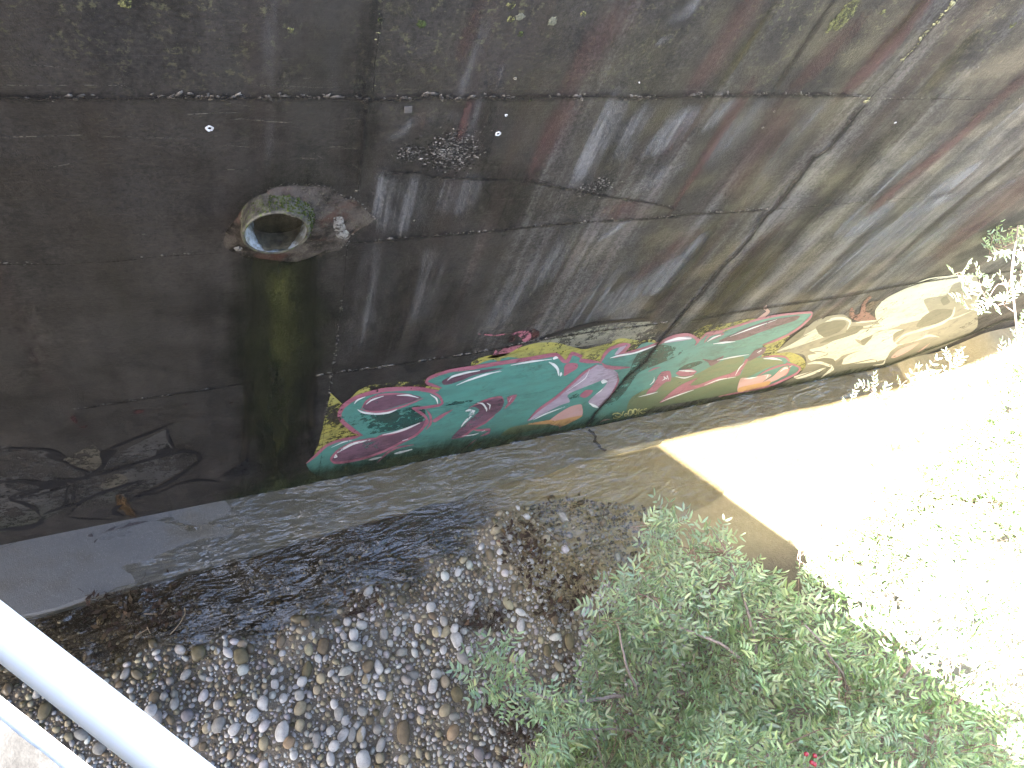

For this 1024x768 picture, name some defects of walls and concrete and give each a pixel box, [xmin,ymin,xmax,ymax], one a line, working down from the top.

flaking render [397,127,501,176]
water stain [645,232,711,298]